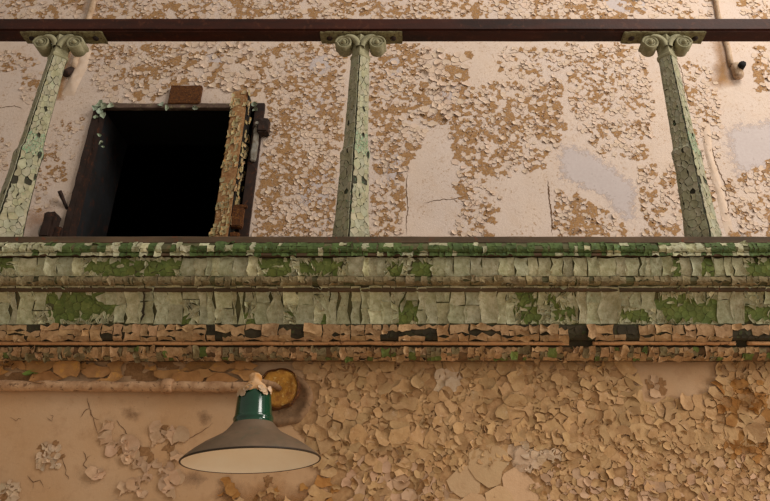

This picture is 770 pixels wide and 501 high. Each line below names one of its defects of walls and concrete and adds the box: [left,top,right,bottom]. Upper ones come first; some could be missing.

peeling [0,49,44,104]
peeling [34,117,85,213]
peeling [88,41,348,237]
peeling [368,42,684,237]
peeling [682,61,770,237]
peeling [751,45,770,92]
peeling [0,188,770,501]